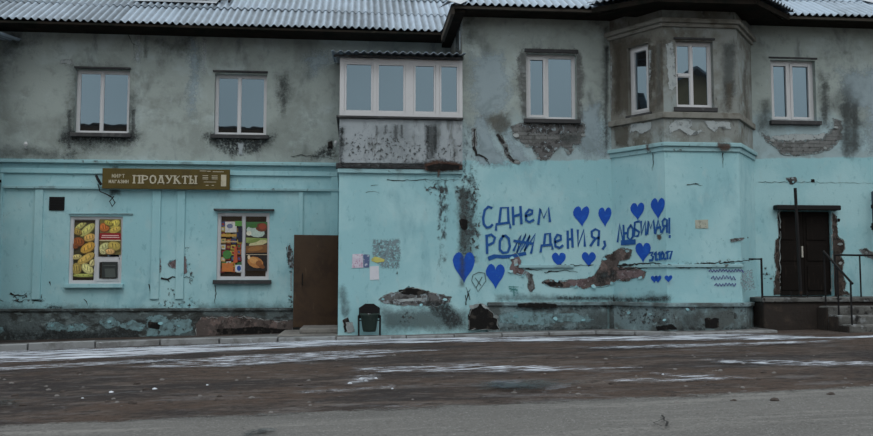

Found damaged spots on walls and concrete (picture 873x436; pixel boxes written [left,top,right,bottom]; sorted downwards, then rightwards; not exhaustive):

damp [312,125,466,171]
spalling [471,48,586,165]
peeling [669,118,731,136]
spalling [761,118,843,157]
damp [842,70,873,152]
damp [460,177,478,263]
peeling [159,247,193,281]
spalling [741,210,781,295]
peeling [45,322,89,332]
spalling [99,288,294,336]
spalling [379,286,452,307]
peeling [468,247,647,331]